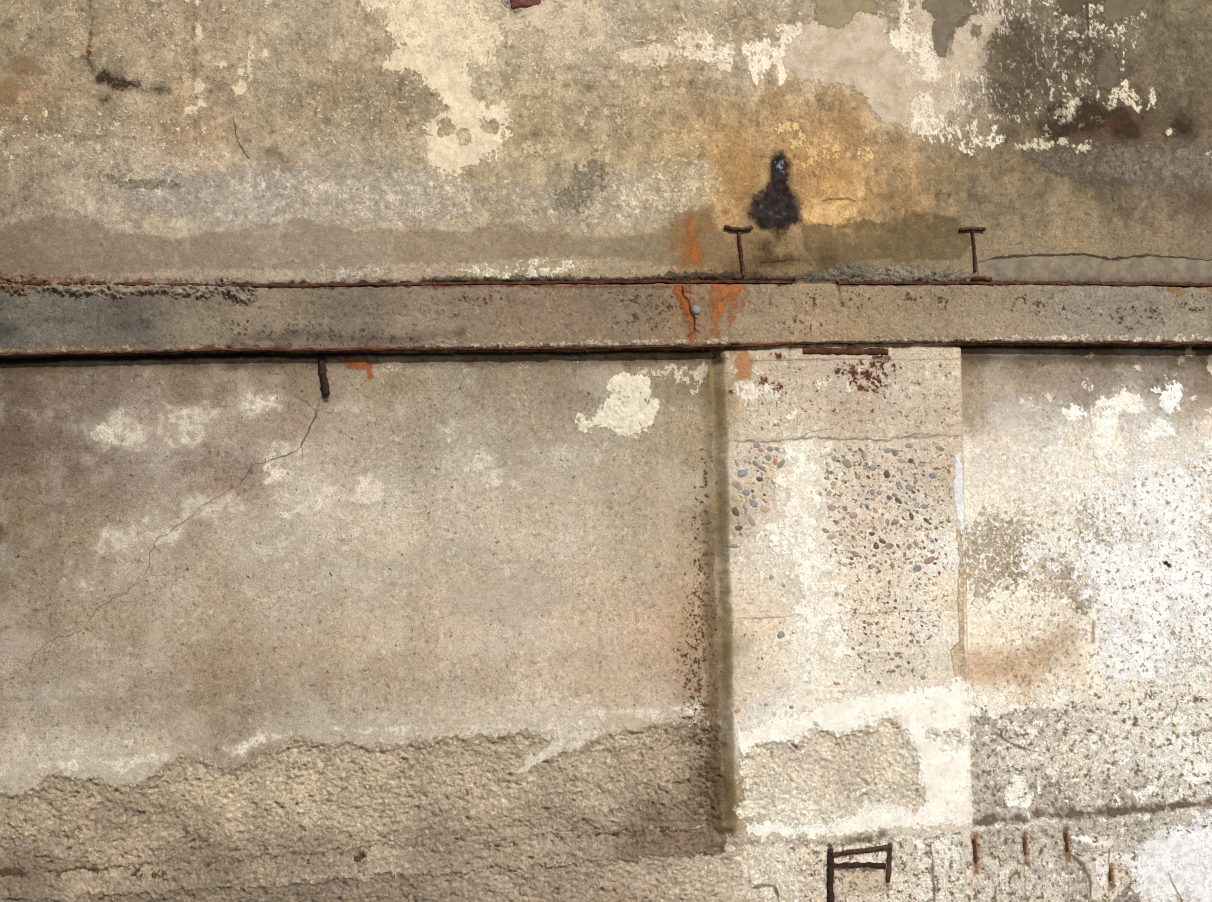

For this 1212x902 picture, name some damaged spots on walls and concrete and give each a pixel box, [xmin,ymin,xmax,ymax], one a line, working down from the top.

flaking render [0,0,1212,236]
rust [269,217,1211,399]